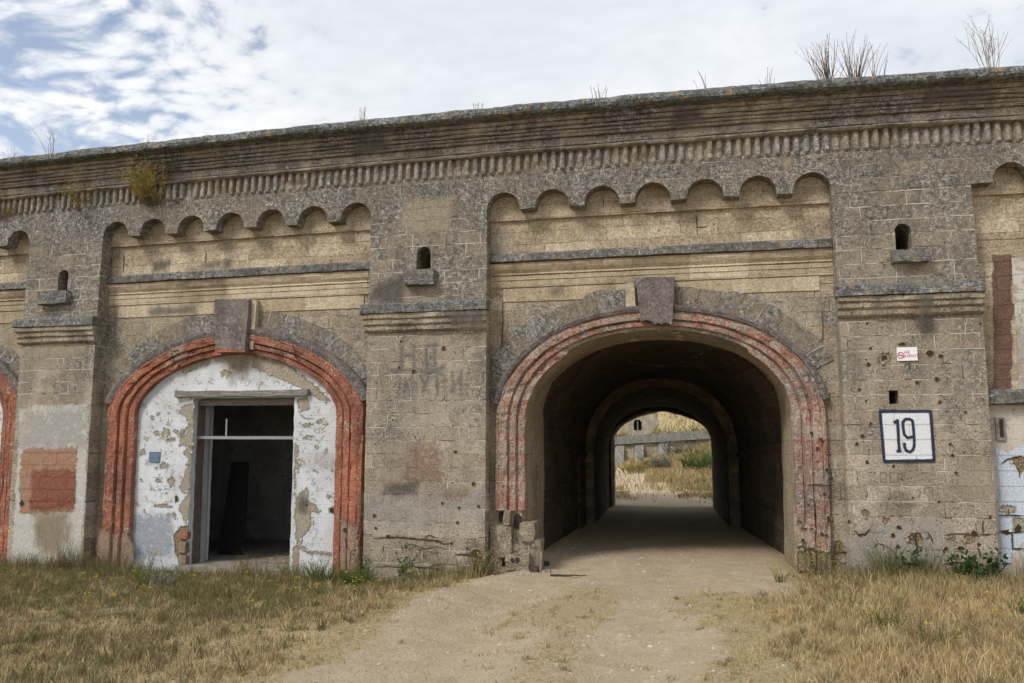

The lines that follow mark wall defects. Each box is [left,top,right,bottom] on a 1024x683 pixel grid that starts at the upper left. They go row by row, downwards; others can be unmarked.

spalling [167,345,231,377]
hole [866,341,907,367]
hole [923,349,944,359]
peeling [135,403,196,539]
peeling [252,355,363,575]
peeling [988,445,1024,570]
spalling [466,509,544,575]
spalling [882,516,923,549]
spalling [943,529,981,557]